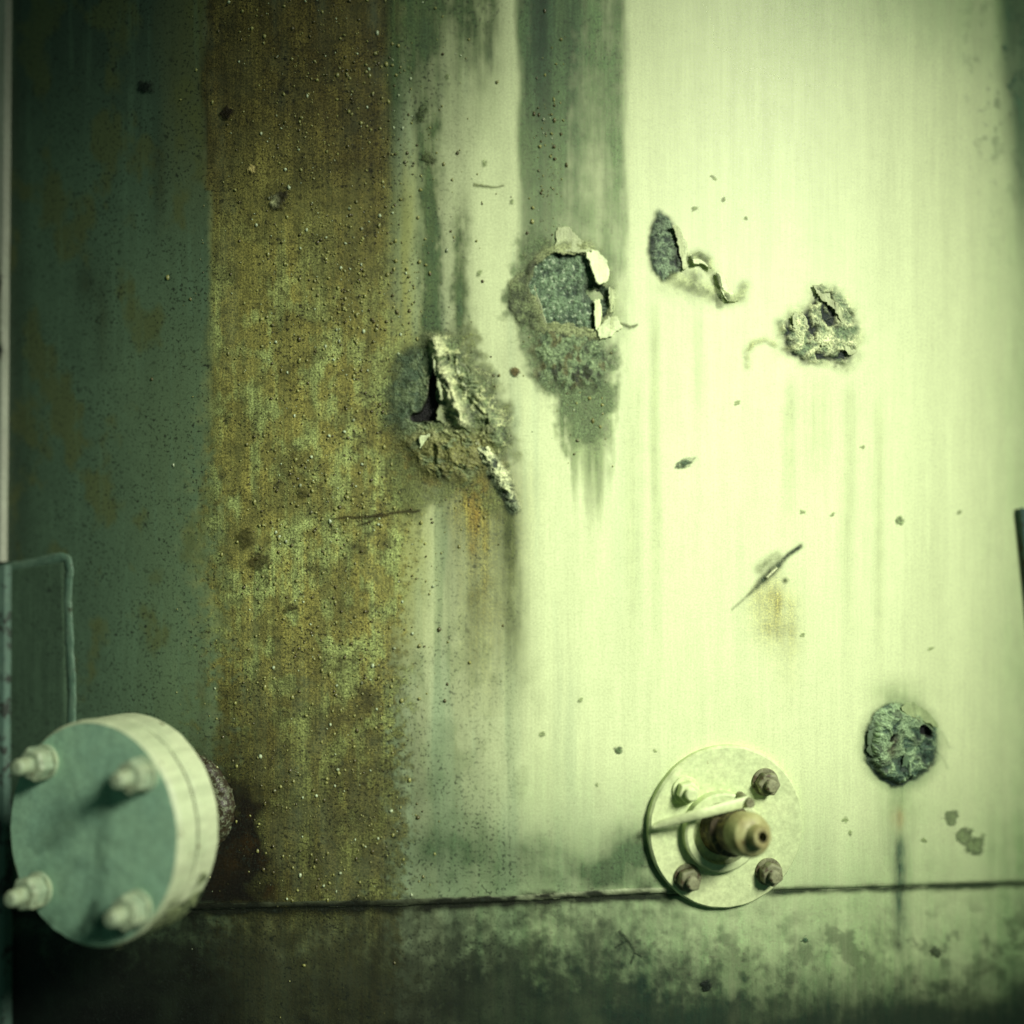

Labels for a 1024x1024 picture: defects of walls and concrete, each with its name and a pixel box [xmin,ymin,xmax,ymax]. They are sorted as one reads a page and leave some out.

damp [517,0,623,258]
peeling [649,210,739,304]
spalling [502,227,622,442]
rust [185,0,681,942]
damp [561,383,612,476]
damp [502,506,516,576]
rust [10,908,40,916]
damp [580,838,646,887]
rust [768,882,1024,895]